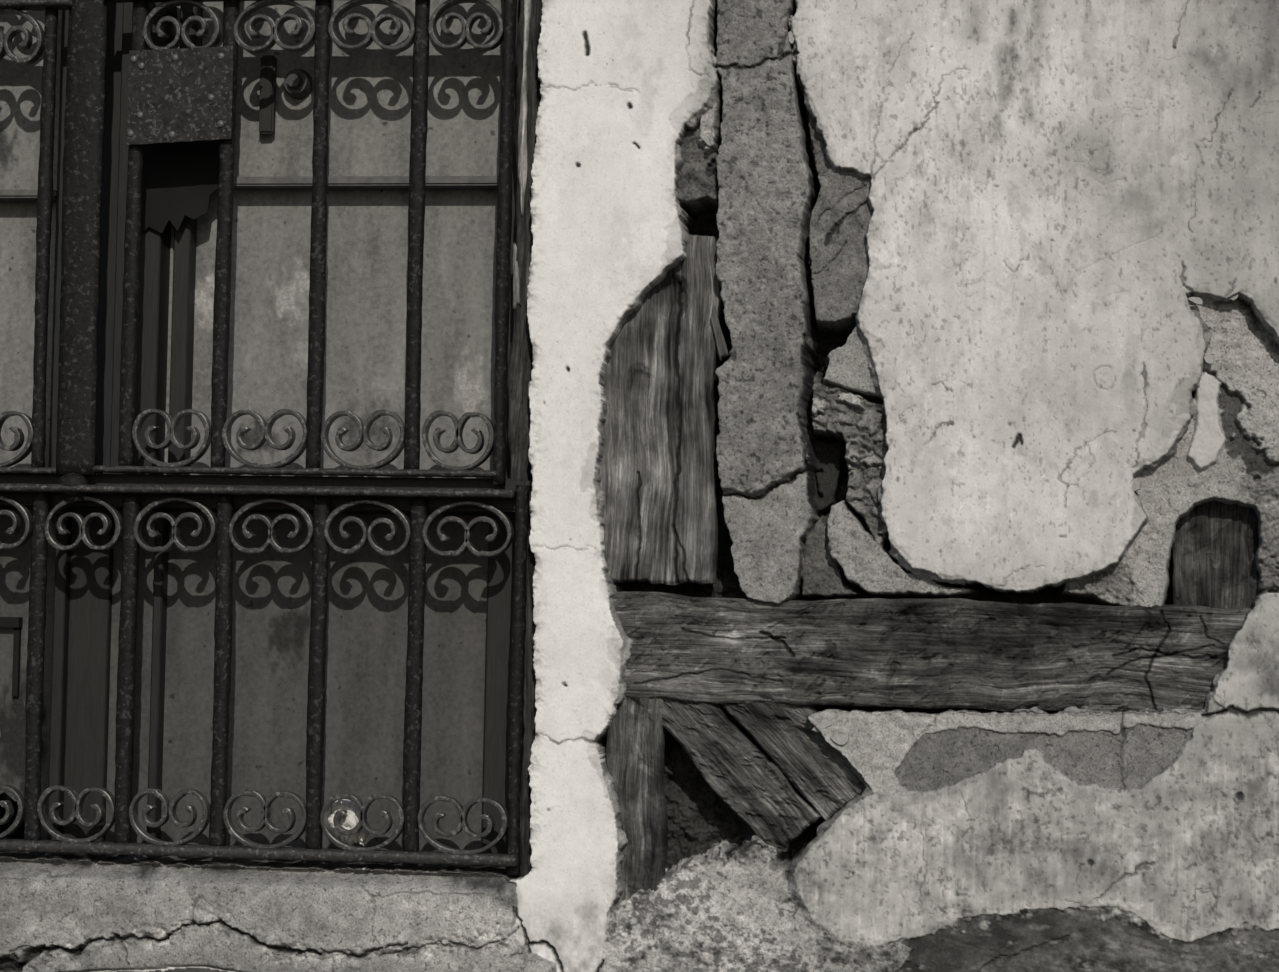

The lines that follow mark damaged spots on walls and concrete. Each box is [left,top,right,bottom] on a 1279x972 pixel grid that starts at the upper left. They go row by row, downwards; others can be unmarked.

crack [1172,0,1190,50]
crack [686,0,971,501]
flaking render [594,339,614,526]
flaking render [598,0,1279,972]
crack [0,886,564,972]